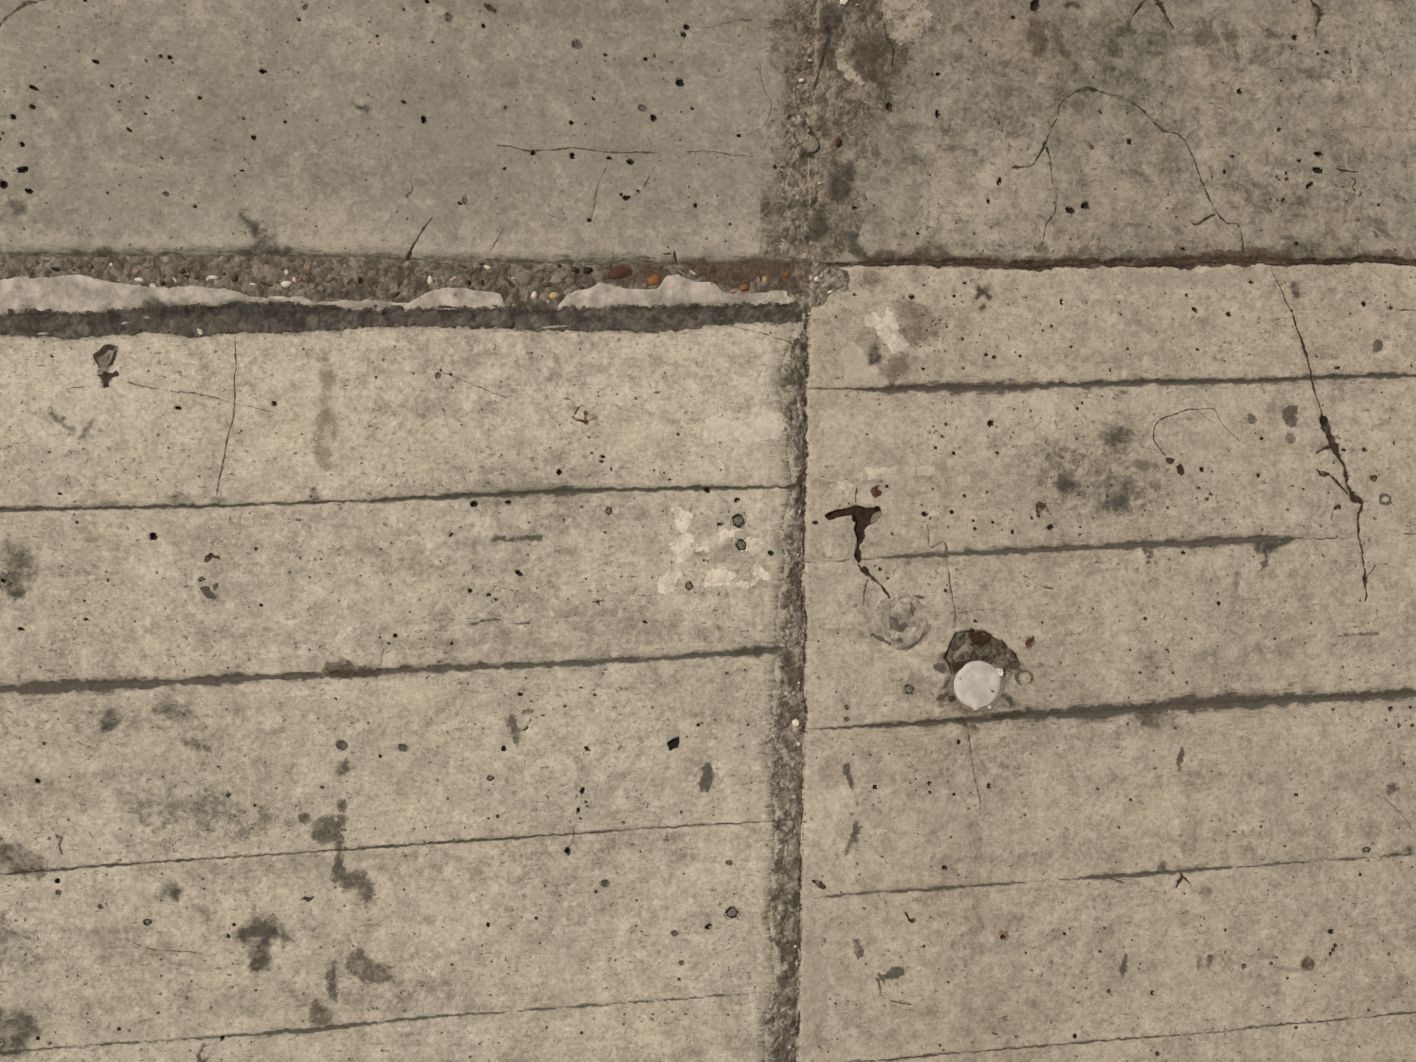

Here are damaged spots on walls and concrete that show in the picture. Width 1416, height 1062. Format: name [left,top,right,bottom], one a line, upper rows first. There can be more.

spalling [0,0,913,329]
crack [1011,87,1375,602]
spalling [934,628,1020,702]